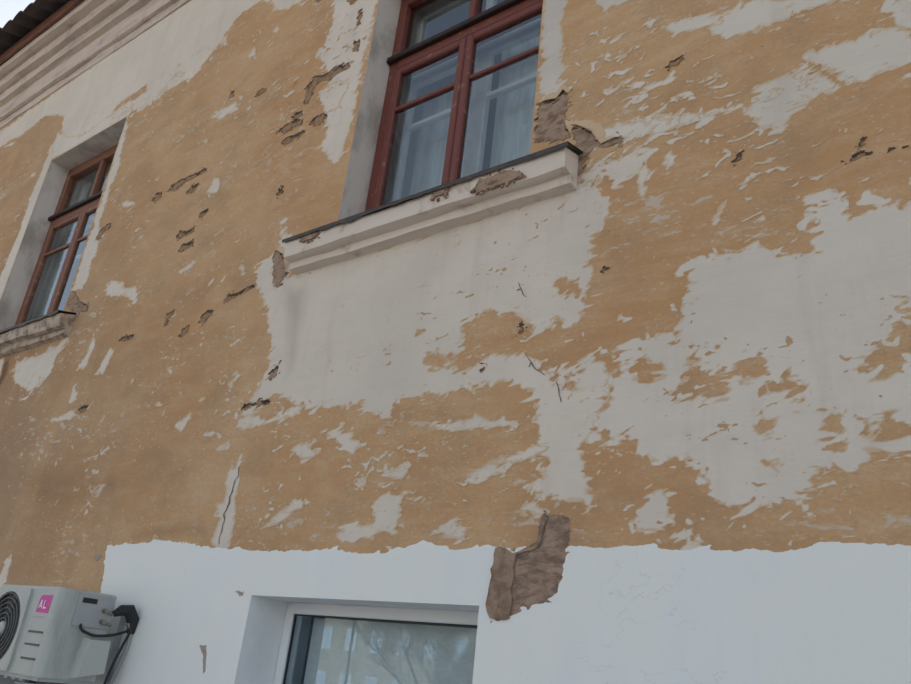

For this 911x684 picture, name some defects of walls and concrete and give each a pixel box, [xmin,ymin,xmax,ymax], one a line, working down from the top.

peeling [0,0,379,517]
peeling [199,645,207,673]
crack [218,467,239,544]
peeling [121,0,911,623]